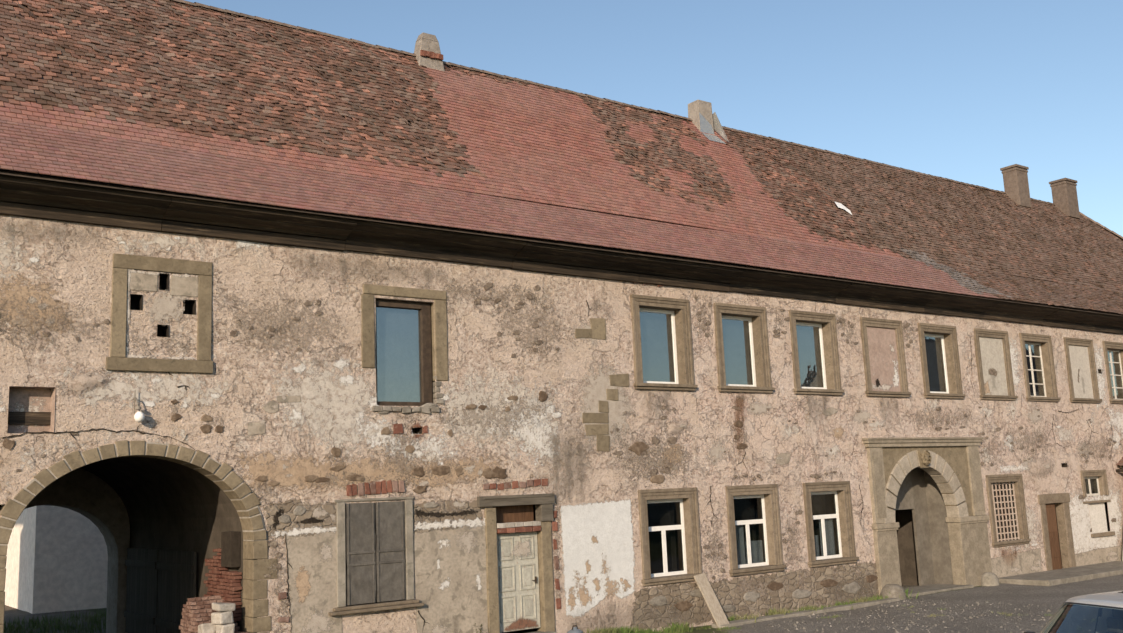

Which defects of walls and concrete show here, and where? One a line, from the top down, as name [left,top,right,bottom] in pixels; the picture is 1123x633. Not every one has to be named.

flaking render [230,320,276,338]
flaking render [294,300,323,321]
crack [2,426,197,451]
peeling [0,362,238,507]
peeling [240,318,684,578]
peeling [552,499,879,630]